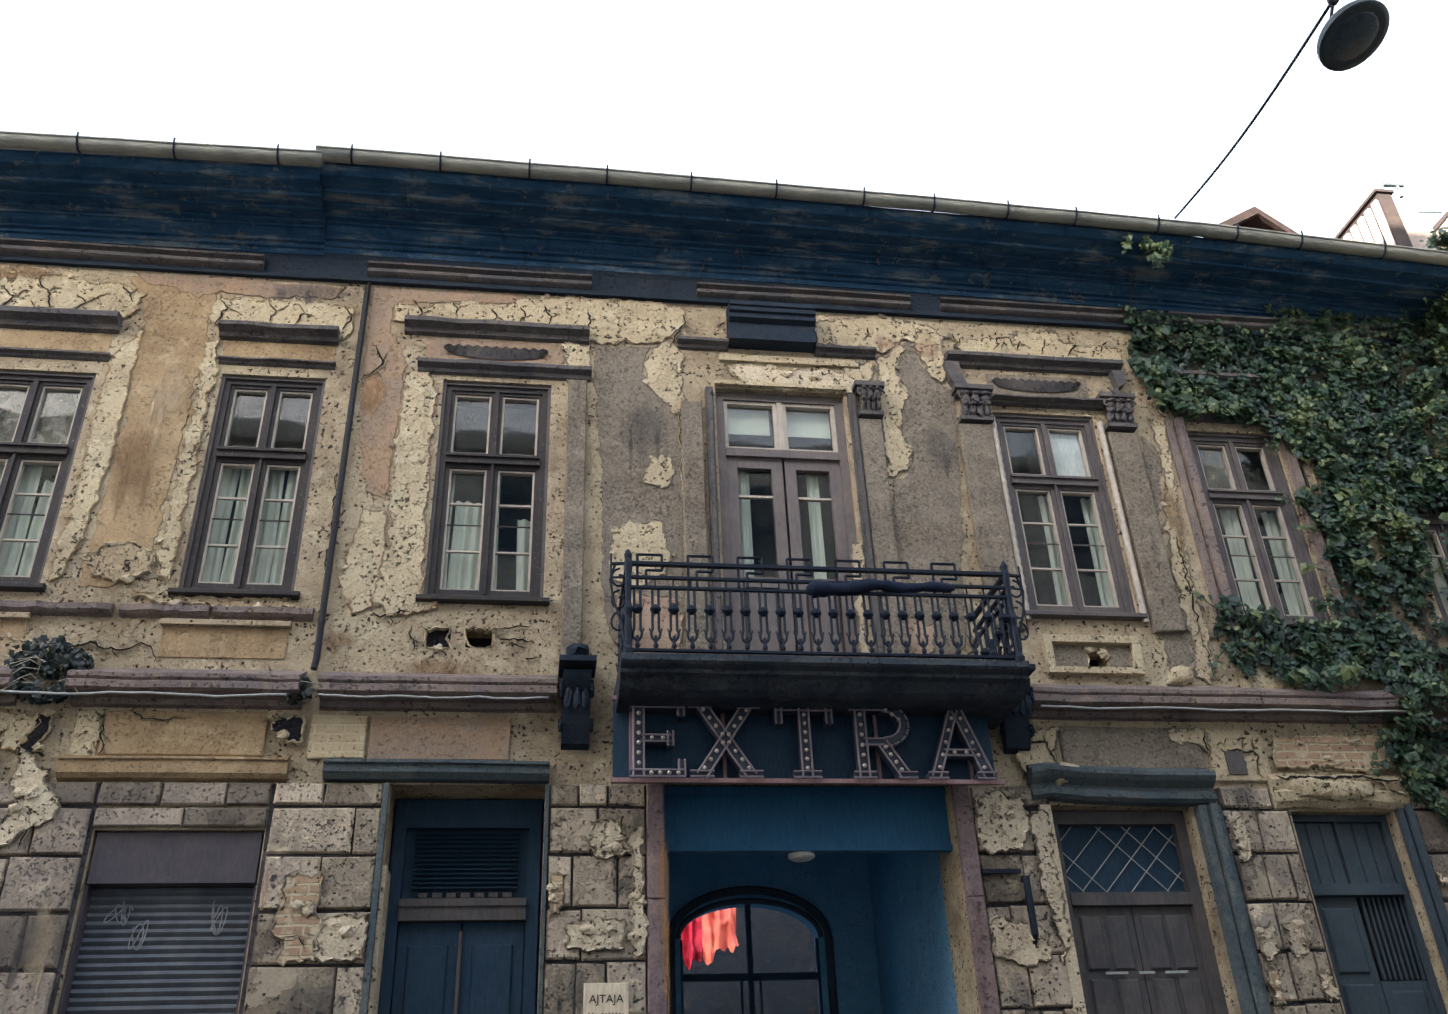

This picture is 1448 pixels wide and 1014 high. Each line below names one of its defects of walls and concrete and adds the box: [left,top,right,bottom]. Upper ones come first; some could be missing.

crack [2,277,138,309]
flaking render [0,271,356,609]
flaking render [337,370,498,652]
flaking render [641,453,676,490]
flaking render [723,313,1123,478]
spalling [0,632,61,666]
spalling [0,709,62,847]
spalling [1269,733,1396,776]
spalling [270,871,370,967]
spalling [973,788,1072,968]